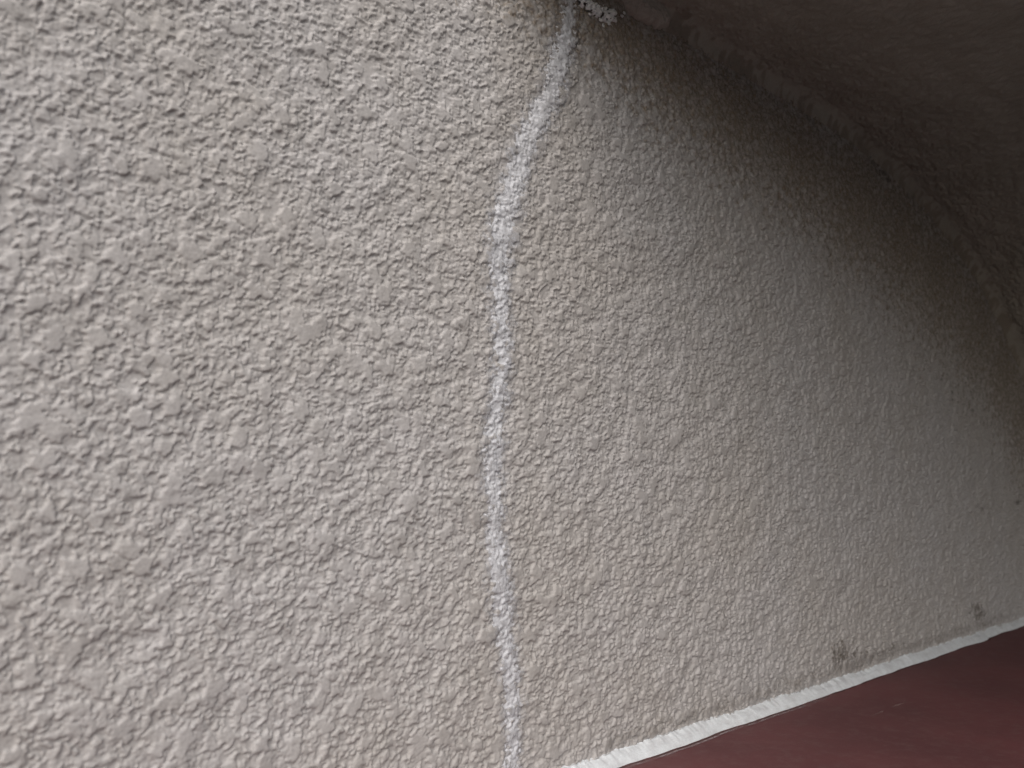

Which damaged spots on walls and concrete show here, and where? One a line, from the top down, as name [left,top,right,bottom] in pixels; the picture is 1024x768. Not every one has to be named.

crack [480,0,580,768]